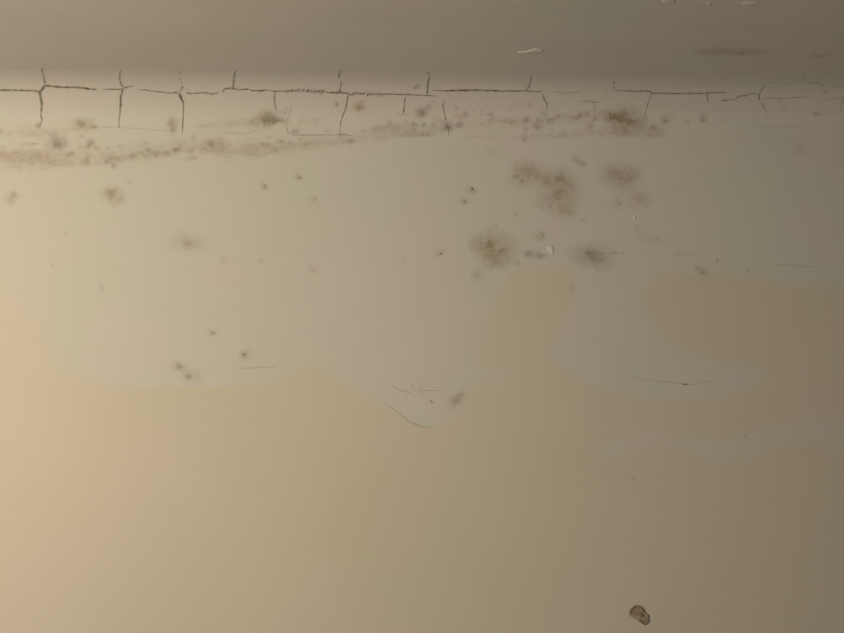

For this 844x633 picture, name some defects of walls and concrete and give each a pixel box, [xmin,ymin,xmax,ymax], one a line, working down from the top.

crack [3,69,123,124]
crack [223,71,545,124]